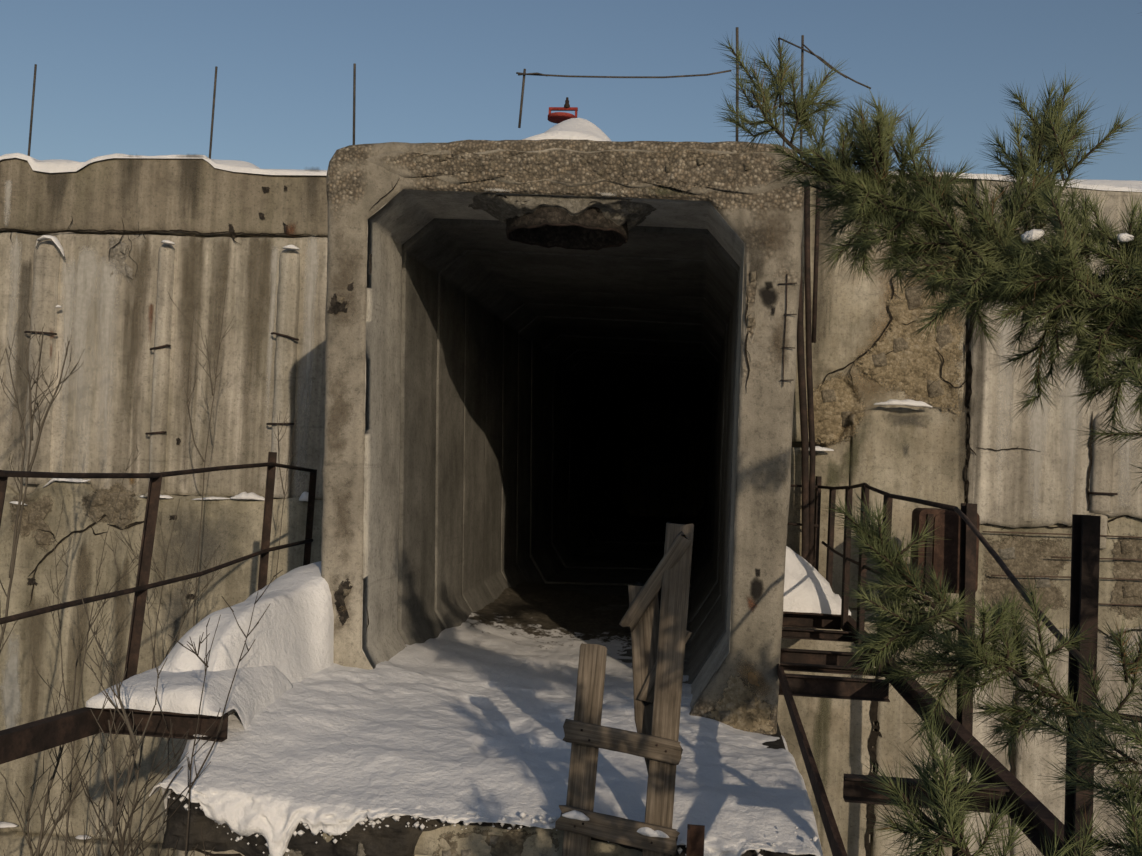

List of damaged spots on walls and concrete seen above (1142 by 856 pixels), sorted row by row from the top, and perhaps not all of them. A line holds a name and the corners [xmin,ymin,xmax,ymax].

water stain [50,172,66,197]
crack [0,218,316,275]
water stain [63,251,115,418]
water stain [249,238,277,381]
spalling [807,269,966,446]
crack [930,293,1041,503]
crack [1002,412,1135,533]
spalling [334,578,352,625]
rust [748,569,763,609]
spalling [706,675,774,733]
crack [868,678,882,776]
spalling [432,828,560,856]